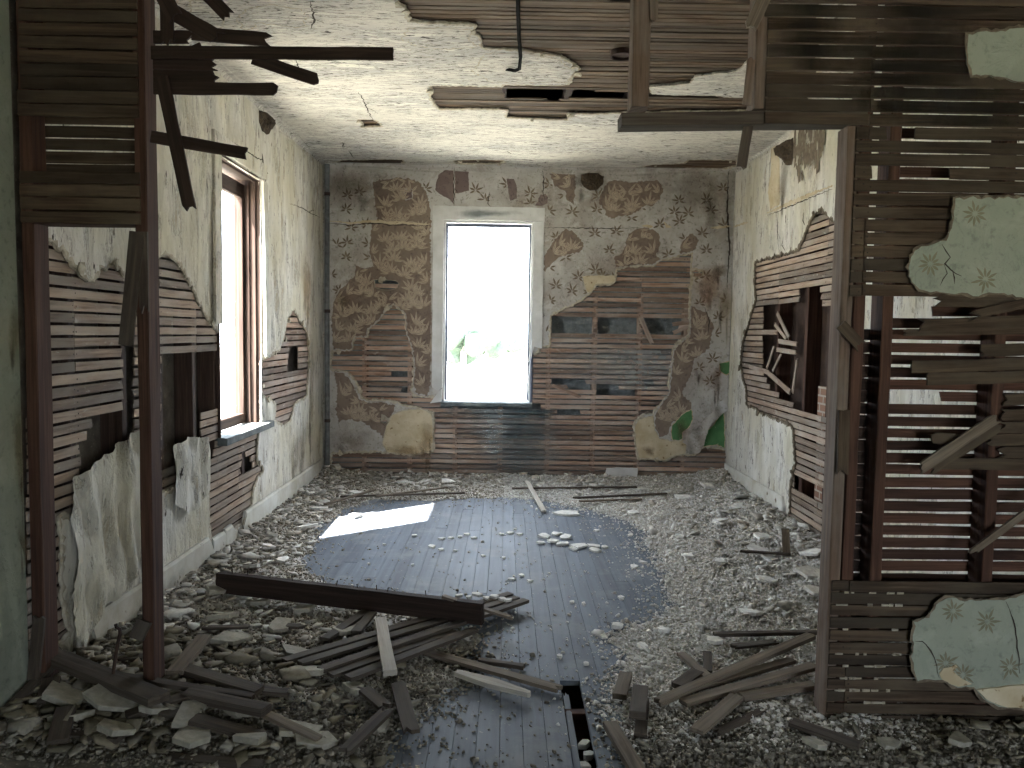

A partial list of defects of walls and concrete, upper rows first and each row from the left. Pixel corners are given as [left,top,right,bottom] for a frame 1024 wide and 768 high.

crack [310,2,323,28]
flaking render [395,0,630,122]
flaking render [646,0,750,112]
peeling [768,130,825,209]
crack [940,245,961,285]
spalling [905,194,1024,300]
flaking render [49,238,140,646]
flaking render [159,250,265,540]
flaking render [258,308,312,427]
flaking render [330,252,726,476]
flaking render [719,206,834,535]